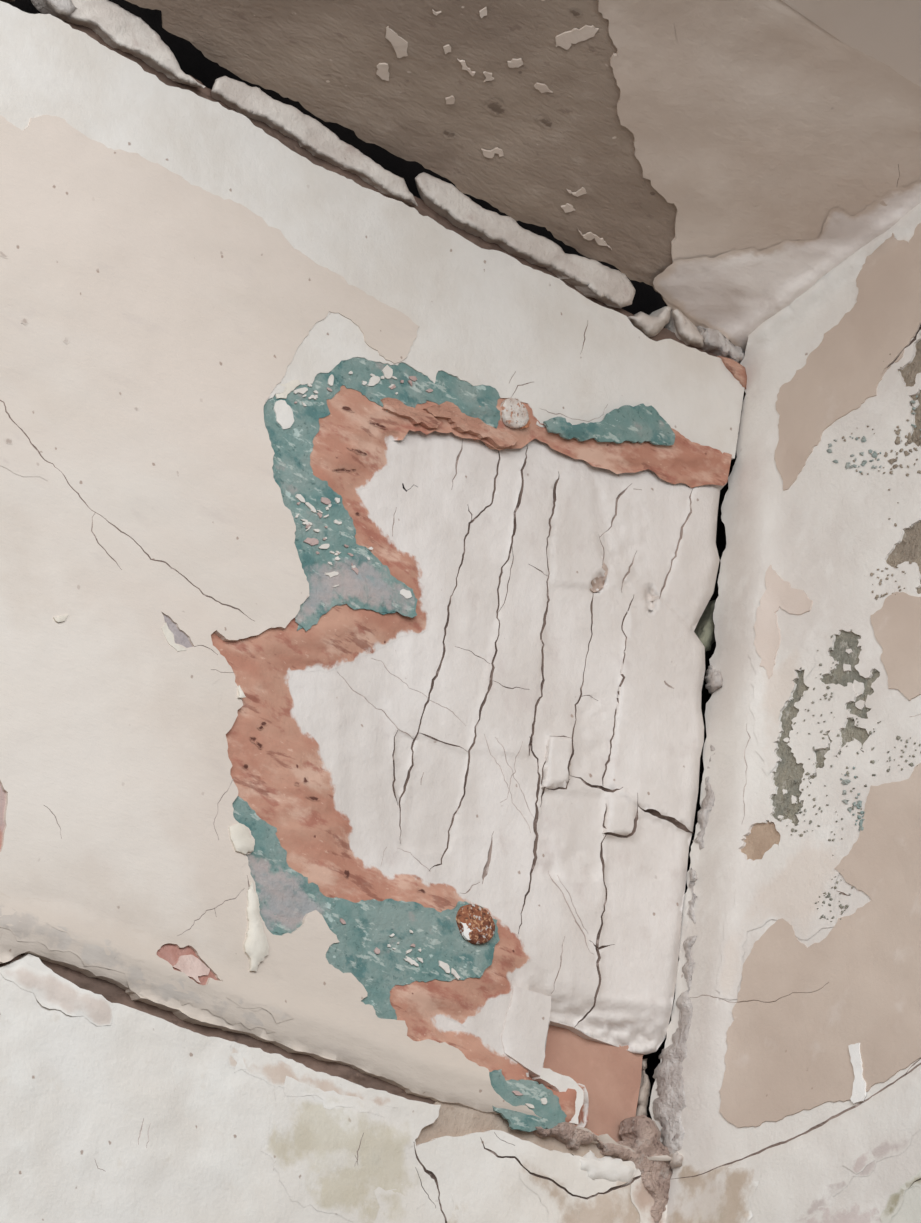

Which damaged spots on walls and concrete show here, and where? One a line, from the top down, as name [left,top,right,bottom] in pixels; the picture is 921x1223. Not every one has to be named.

peeling [774,223,921,491]
crack [0,400,254,621]
peeling [0,0,745,1159]
crack [381,440,694,1028]
damp [748,642,816,775]
peeling [741,521,921,861]
peeling [719,763,921,1128]
crack [414,1144,447,1223]
crack [480,1132,641,1200]
crack [674,1058,921,1179]